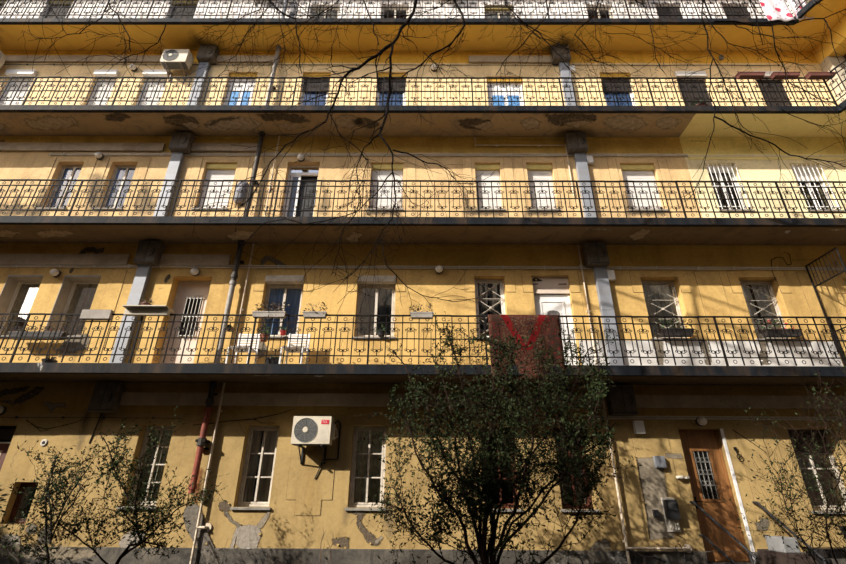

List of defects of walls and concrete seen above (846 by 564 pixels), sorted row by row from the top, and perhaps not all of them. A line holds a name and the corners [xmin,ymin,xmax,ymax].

spalling [218,501,242,527]
spalling [352,511,383,546]
spalling [331,537,350,549]